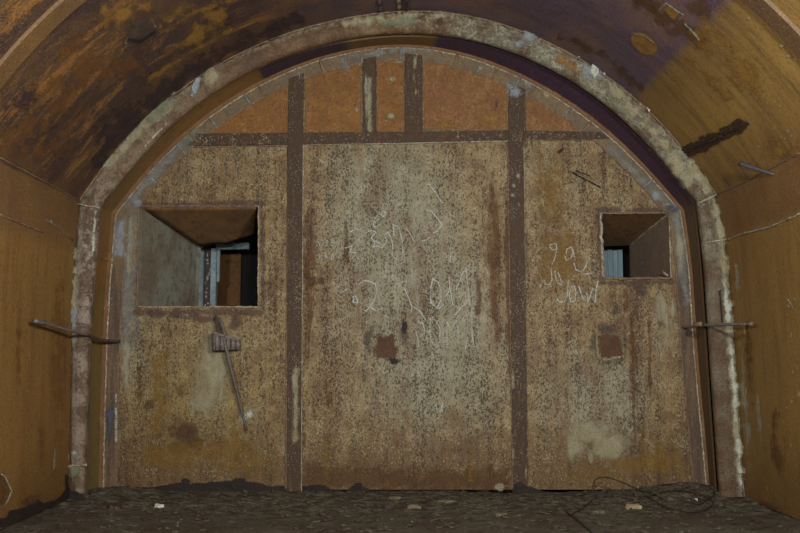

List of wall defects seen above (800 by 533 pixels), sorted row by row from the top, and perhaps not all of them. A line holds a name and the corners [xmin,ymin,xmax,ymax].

corrosion [149,0,236,81]
peeling [608,83,752,194]
corrosion [488,188,510,346]
corrosion [364,320,407,364]
corrosion [590,319,636,402]